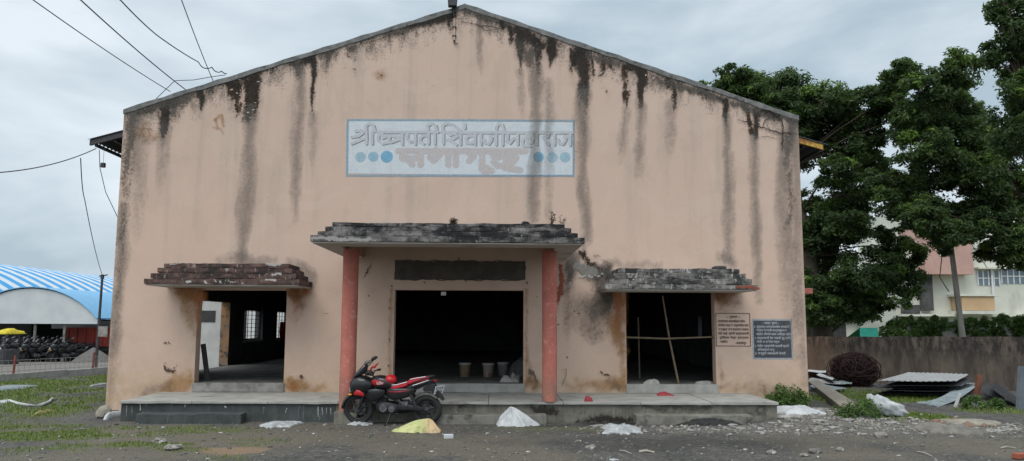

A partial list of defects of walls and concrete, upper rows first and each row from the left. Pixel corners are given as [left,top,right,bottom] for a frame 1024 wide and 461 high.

leakage [116,71,262,255]
leakage [289,51,331,116]
leakage [344,8,798,224]
leakage [589,265,613,322]